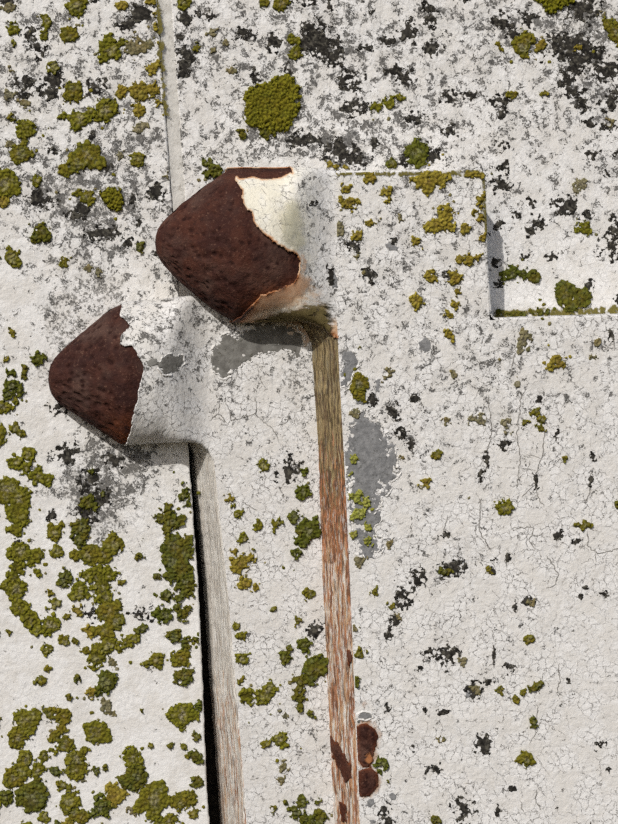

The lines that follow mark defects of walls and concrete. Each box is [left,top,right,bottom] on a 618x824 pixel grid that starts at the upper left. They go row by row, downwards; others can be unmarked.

crack [209,398,289,439]
crack [480,354,545,505]
crack [479,500,491,551]
crack [512,526,559,588]
crack [587,532,618,559]
rust [330,721,380,797]
rust [339,801,347,822]